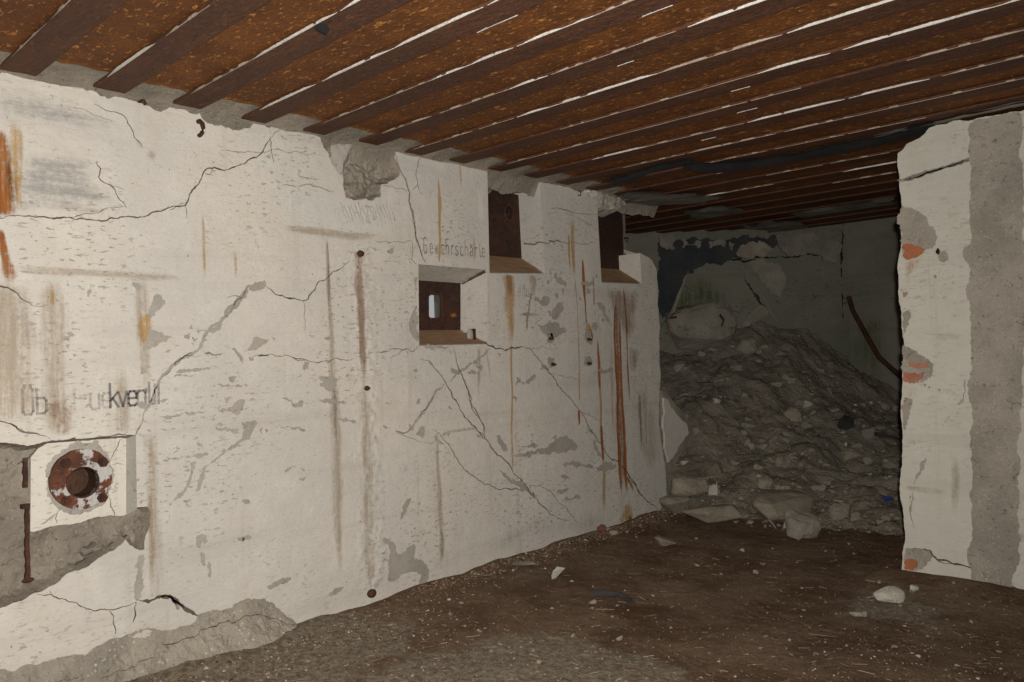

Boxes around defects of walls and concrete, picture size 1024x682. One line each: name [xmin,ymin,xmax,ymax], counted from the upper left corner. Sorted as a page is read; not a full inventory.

corrosion [0,130,21,214]
crack [0,131,334,222]
crack [897,157,969,182]
corrosion [0,231,14,277]
spalling [897,206,948,262]
crack [0,260,354,465]
corrosion [568,227,638,500]
spalling [923,101,1024,587]
corrosion [20,503,34,583]
spalling [0,435,151,608]
crack [37,592,198,634]
spalling [0,577,298,682]